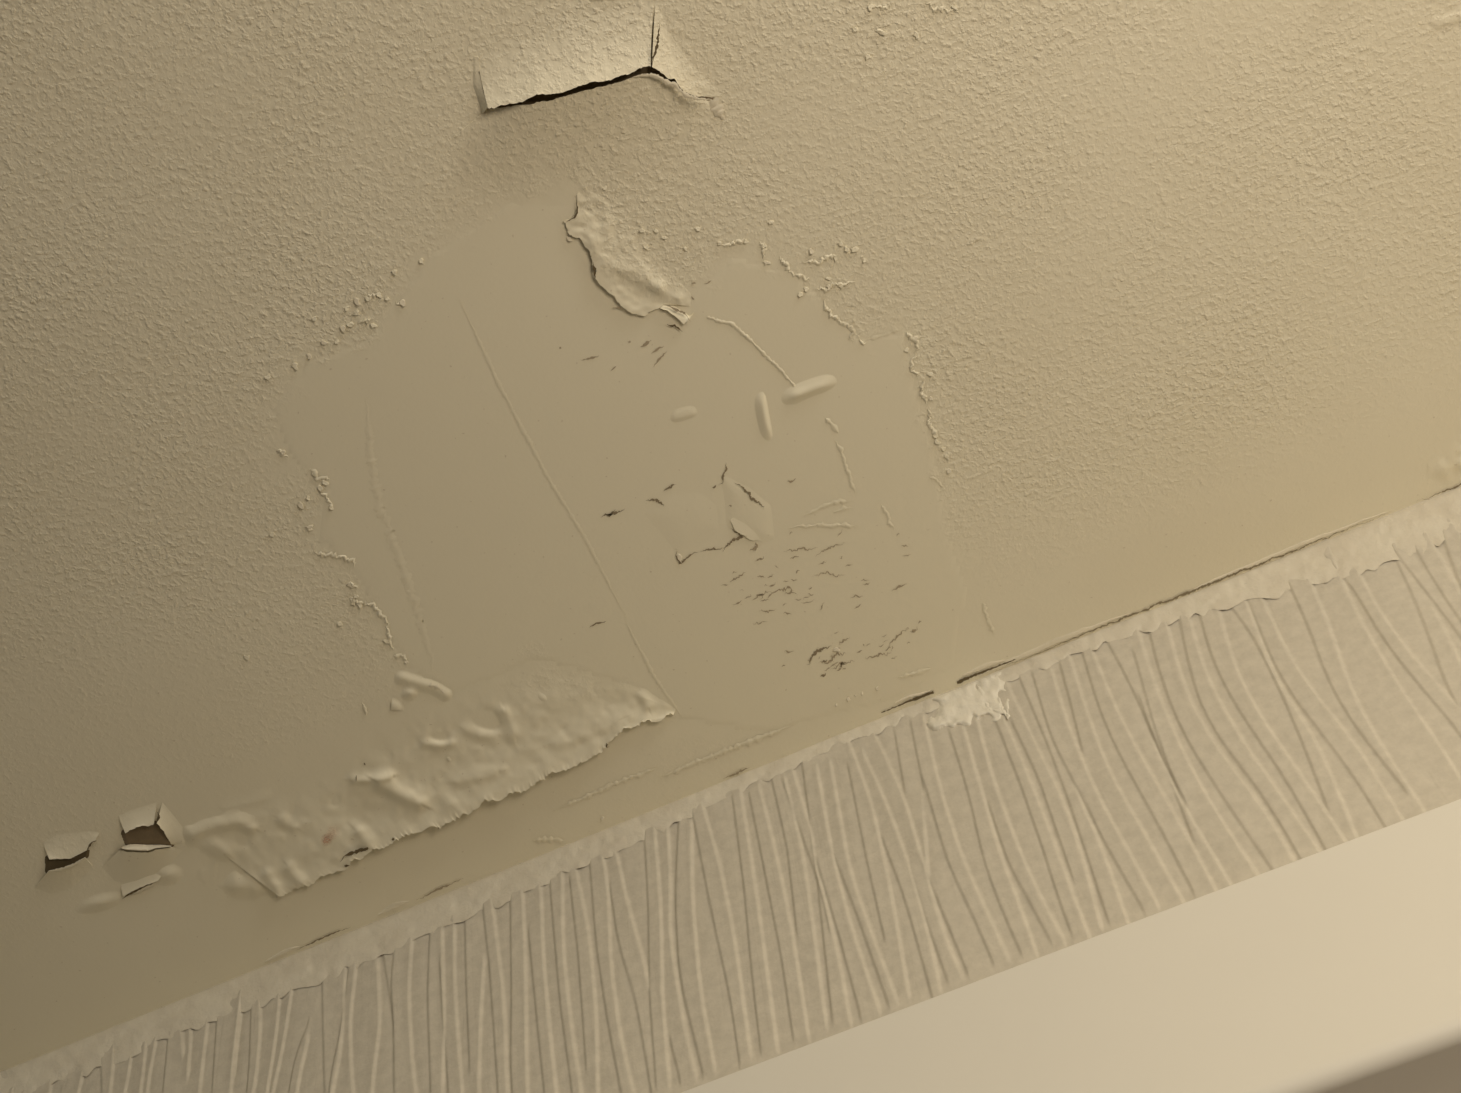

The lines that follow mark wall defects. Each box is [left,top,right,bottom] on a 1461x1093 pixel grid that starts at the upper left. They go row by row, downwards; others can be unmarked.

peeling [445,0,725,331]
peeling [718,238,866,346]
peeling [712,465,774,550]
peeling [121,661,676,902]
peeling [35,831,99,894]